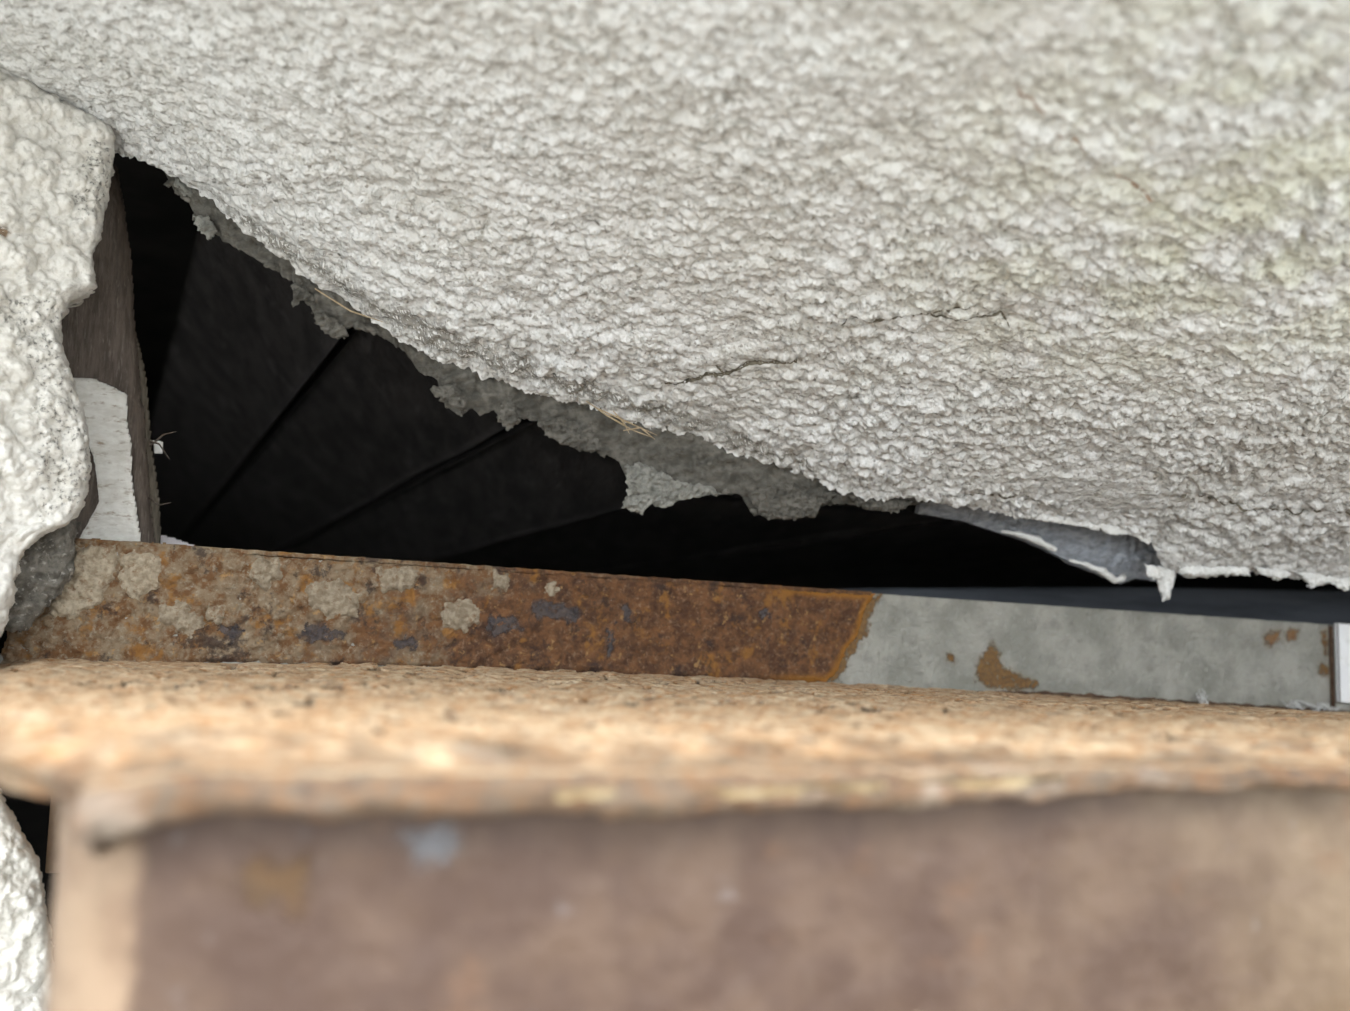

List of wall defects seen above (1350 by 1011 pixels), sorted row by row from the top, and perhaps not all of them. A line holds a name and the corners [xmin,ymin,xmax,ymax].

spalling [163,172,1350,602]
corrosion [0,538,882,683]
corrosion [975,643,1039,691]